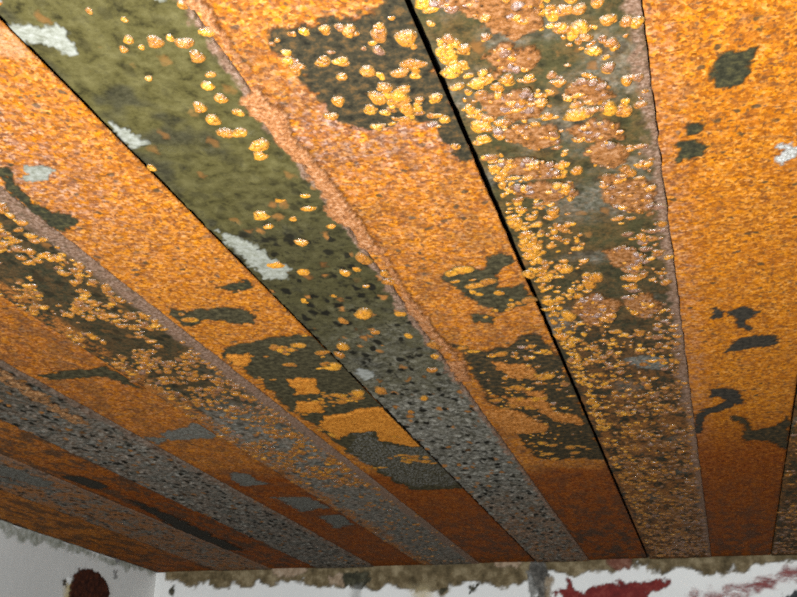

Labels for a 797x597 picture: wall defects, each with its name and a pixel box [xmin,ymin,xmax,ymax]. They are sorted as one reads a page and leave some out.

corrosion [268,23,360,81]
corrosion [200,71,245,117]
corrosion [192,101,270,161]
corrosion [323,96,345,120]
corrosion [288,194,317,222]
corrosion [359,0,797,577]
corrosion [0,202,531,597]